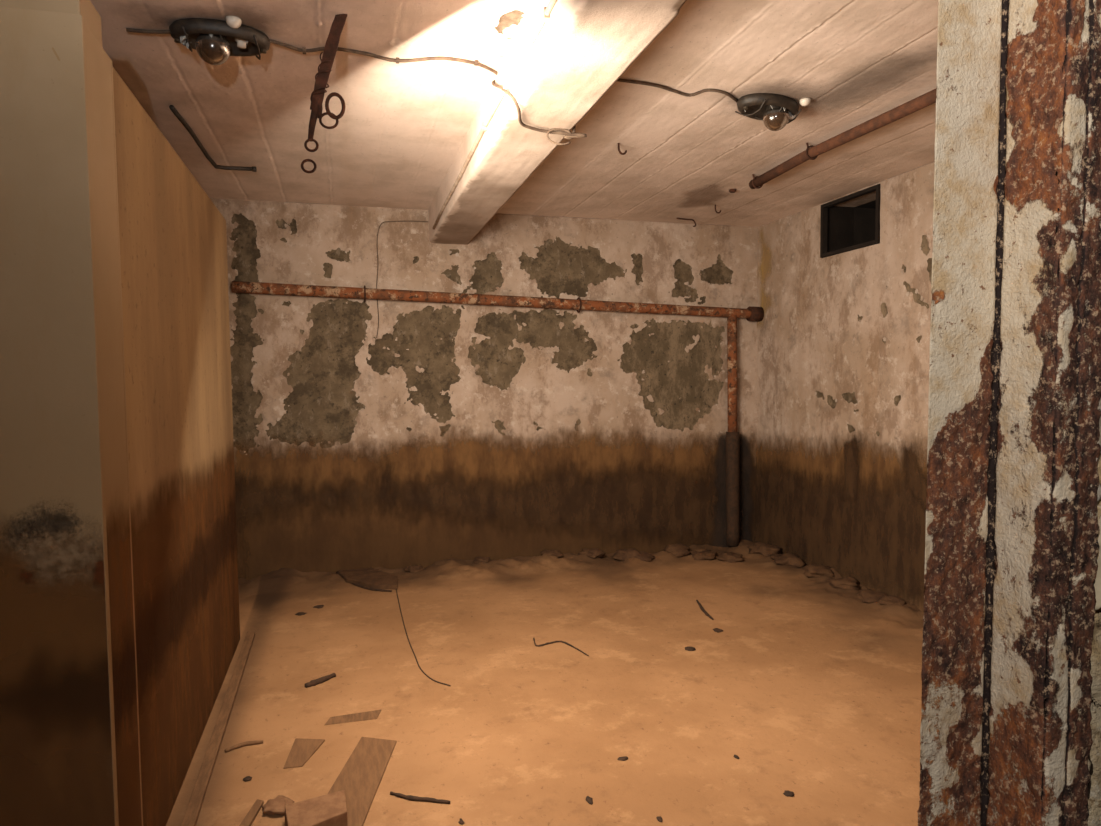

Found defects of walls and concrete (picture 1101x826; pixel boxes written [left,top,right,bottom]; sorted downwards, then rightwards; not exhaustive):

spalling [229,213,643,455]
spalling [617,318,725,432]
spalling [669,254,733,305]
water stain [0,432,927,826]
crack [1086,754,1094,799]
spalling [1088,610,1101,826]